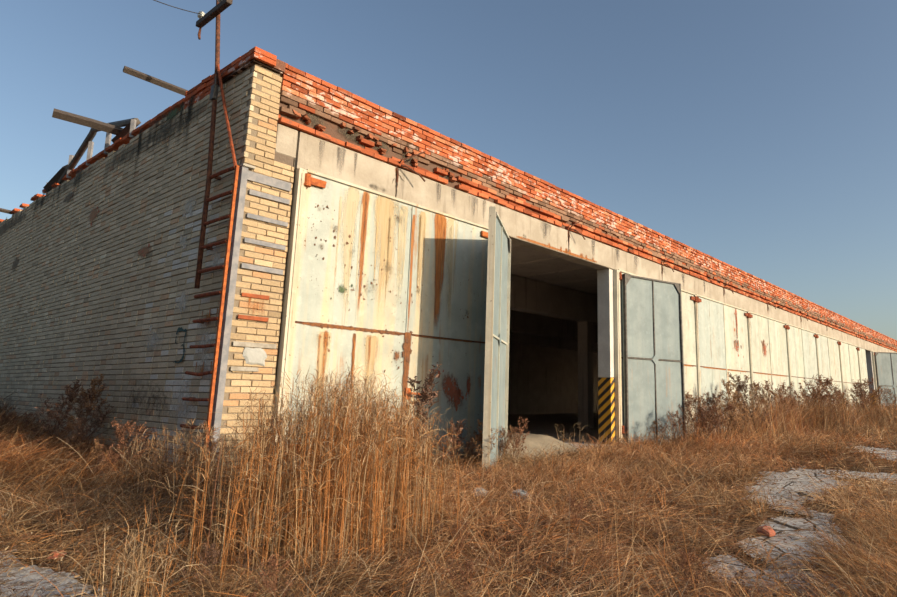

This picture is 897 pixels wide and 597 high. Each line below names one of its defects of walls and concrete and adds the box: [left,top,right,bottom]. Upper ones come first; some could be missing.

damp [113,97,199,164]
spalling [292,109,326,132]
spalling [339,122,418,167]
corrosion [358,192,369,305]
corrosion [434,213,446,323]
corrosion [303,322,472,400]
corrosion [704,309,746,372]